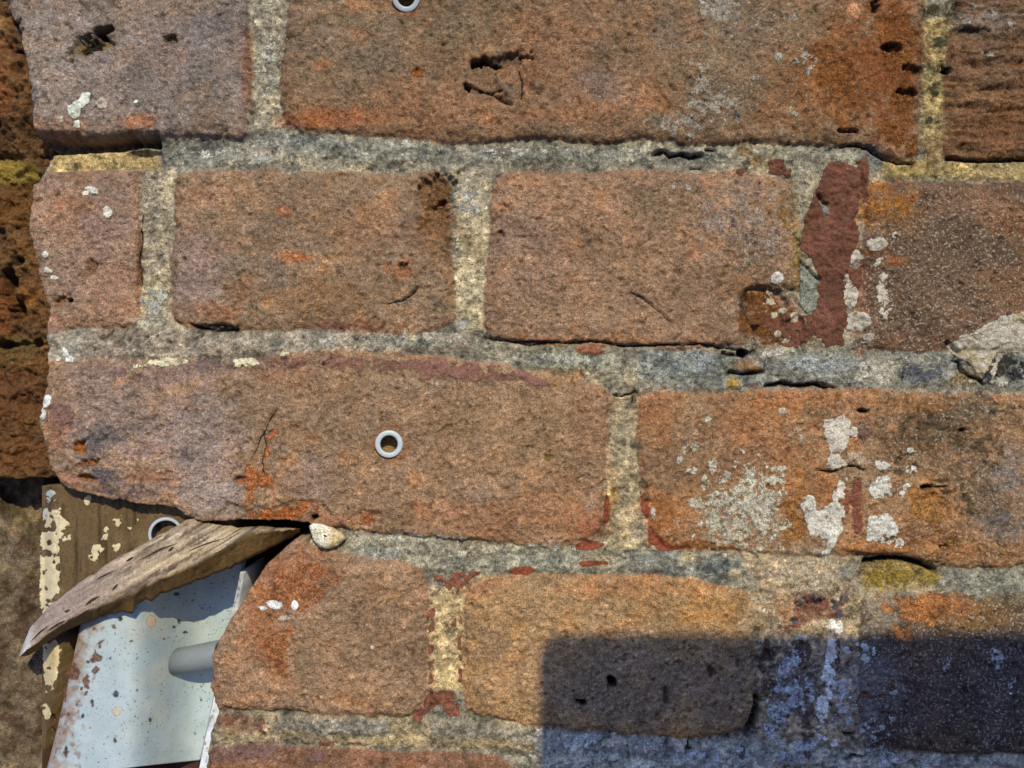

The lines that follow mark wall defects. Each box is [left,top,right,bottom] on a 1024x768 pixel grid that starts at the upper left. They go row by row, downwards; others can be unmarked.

peeling [957,356,1001,388]
crack [252,411,276,477]
damp [676,414,917,625]